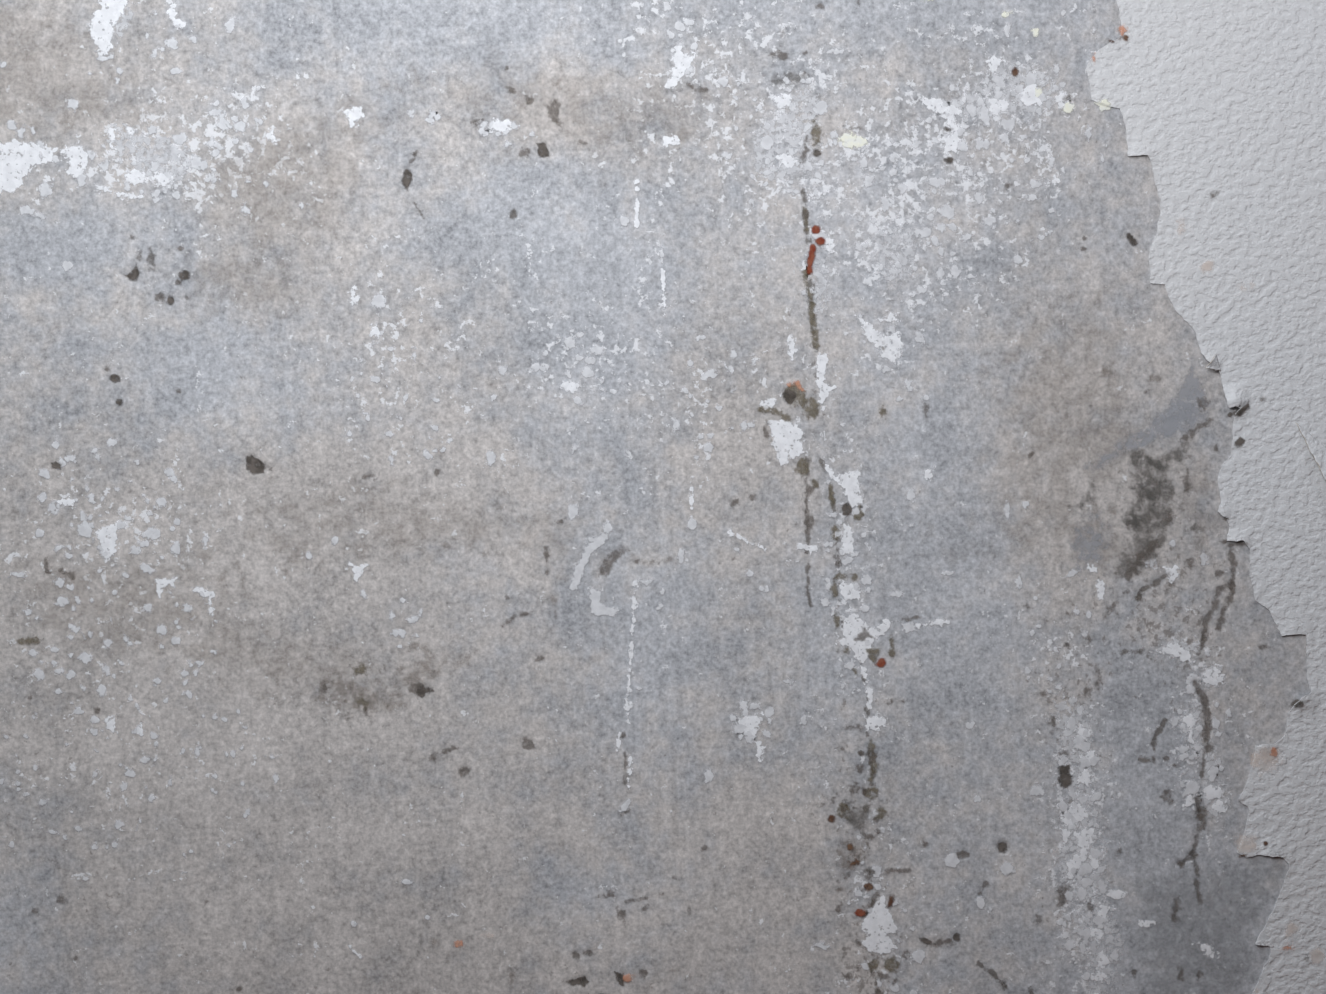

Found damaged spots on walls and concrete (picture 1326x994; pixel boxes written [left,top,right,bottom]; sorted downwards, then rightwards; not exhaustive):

peeling [773,128,790,149]
crack [803,121,821,157]
rust [803,210,825,274]
peeling [1206,354,1221,371]
crack [758,208,950,994]
crack [1123,575,1165,600]
crack [1138,551,1237,922]
crack [944,853,960,868]
crack [976,881,992,914]
peeling [1070,898,1098,930]
peeling [1088,882,1104,920]